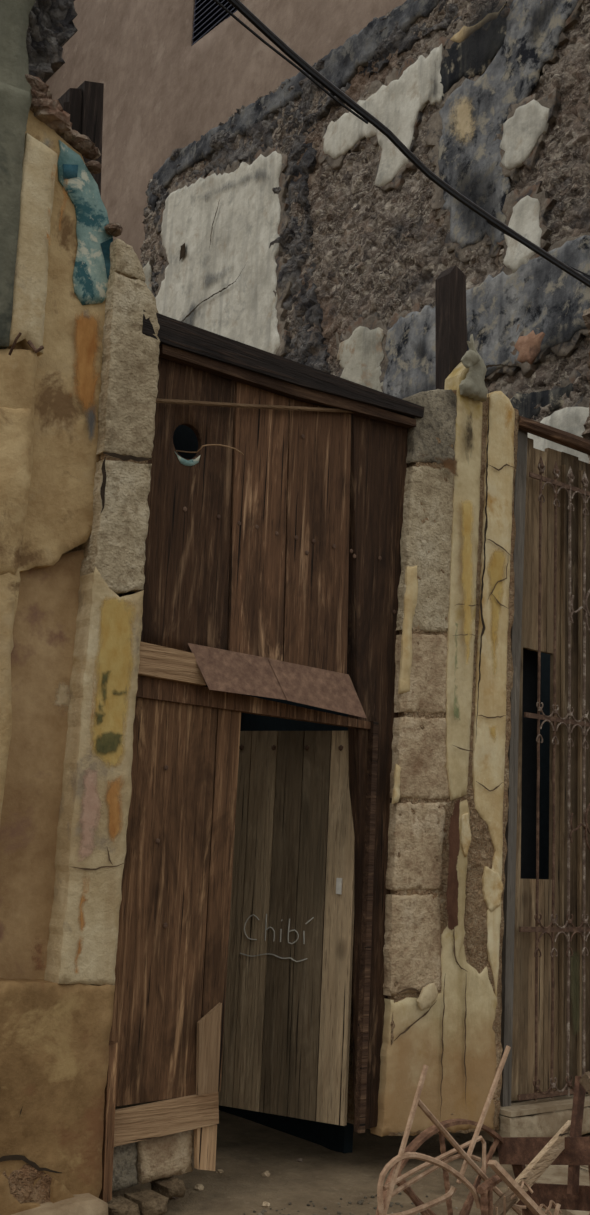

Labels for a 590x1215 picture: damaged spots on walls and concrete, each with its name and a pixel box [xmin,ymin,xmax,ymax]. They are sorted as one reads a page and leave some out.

flaking render [142,144,293,357]
flaking render [318,0,590,463]
flaking render [460,800,503,966]